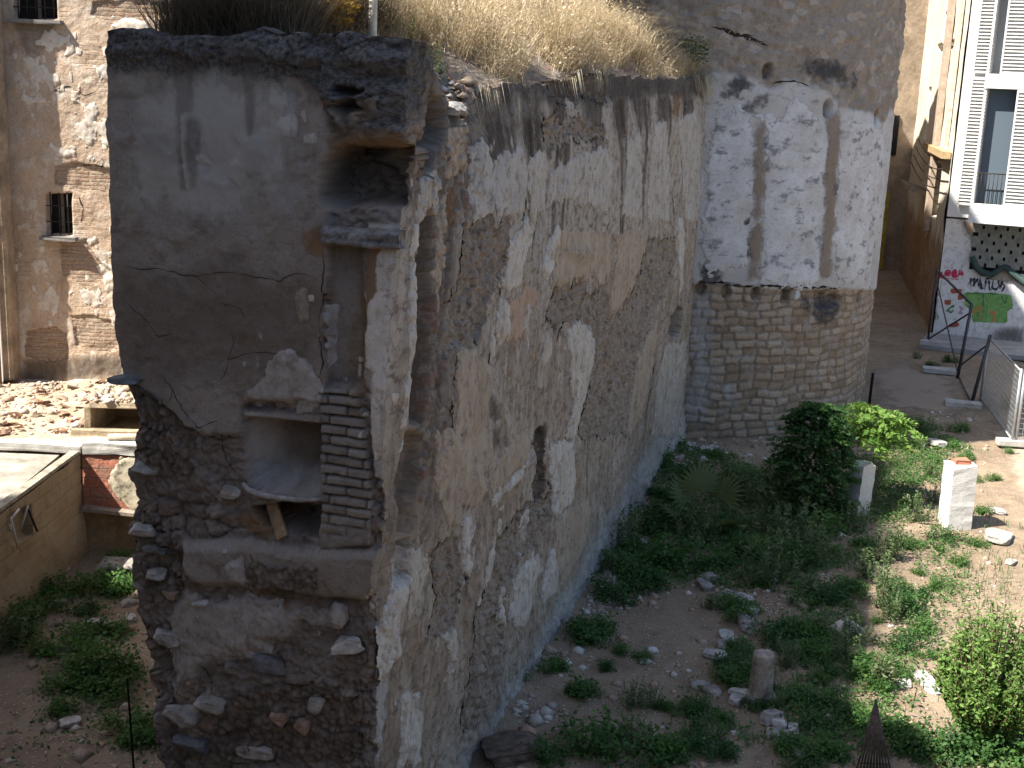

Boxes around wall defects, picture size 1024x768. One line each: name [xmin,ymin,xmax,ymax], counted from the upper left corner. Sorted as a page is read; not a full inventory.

spalling [13,28,110,193]
leakage [484,94,570,170]
leakage [584,83,693,220]
crack [711,26,767,46]
leakage [726,77,767,111]
leakage [805,60,857,86]
spalling [15,236,119,363]
crack [129,245,326,381]
peeling [242,348,325,417]
peeling [295,286,340,369]
spalling [343,72,884,735]
spalling [108,385,365,763]